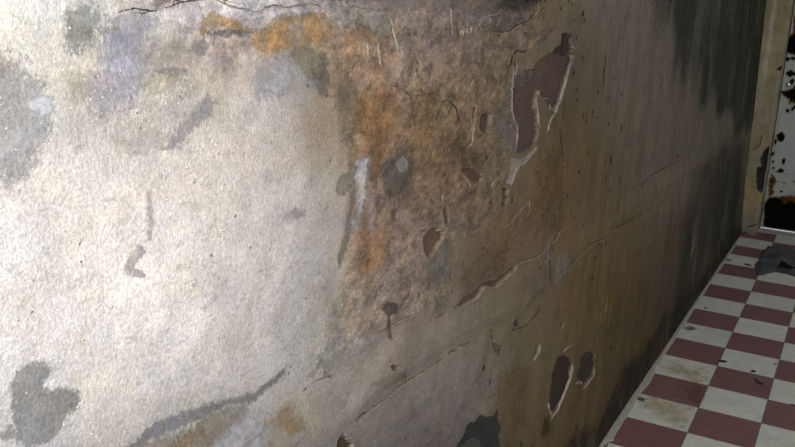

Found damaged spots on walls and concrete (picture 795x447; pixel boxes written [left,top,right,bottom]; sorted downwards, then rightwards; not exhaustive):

damp [61,0,270,154]
crack [118,0,398,52]
corrosion [199,11,387,67]
crack [390,68,473,125]
spalling [458,11,585,211]
crack [494,0,557,74]
corrosion [781,16,795,113]
damp [565,0,766,447]
corrosion [763,132,795,231]
damp [0,361,79,447]
spalling [333,406,372,447]
spalling [546,345,597,419]